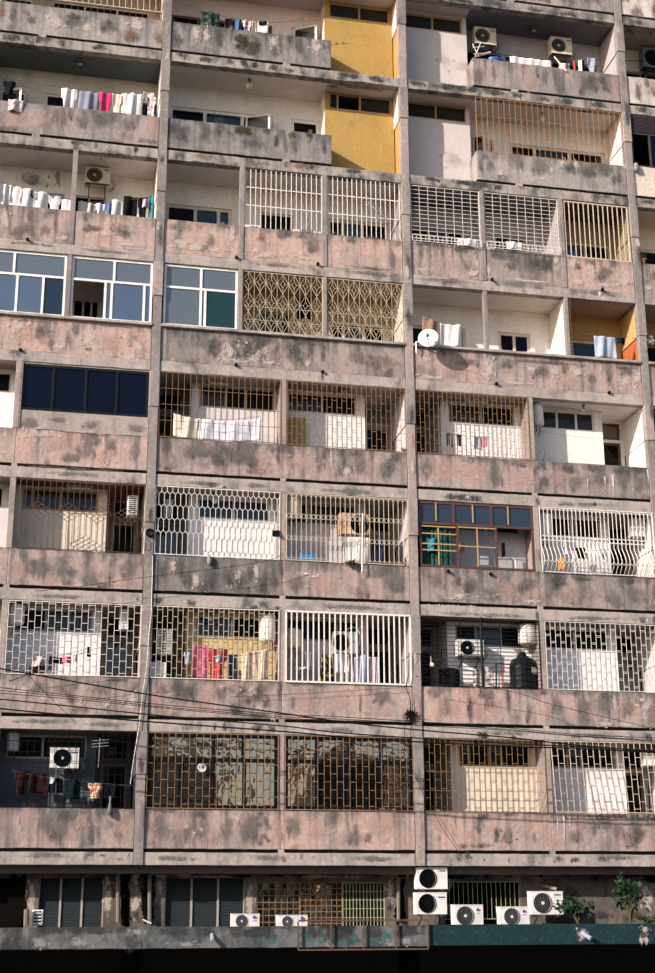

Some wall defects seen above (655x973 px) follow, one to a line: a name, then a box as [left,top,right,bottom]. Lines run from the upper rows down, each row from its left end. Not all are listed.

damp [172,23,273,70]
damp [536,68,564,89]
damp [184,442,263,488]
damp [490,464,503,486]
damp [566,466,649,490]
damp [574,693,610,720]
damp [220,818,275,860]
damp [286,818,299,837]
spalling [101,874,303,934]